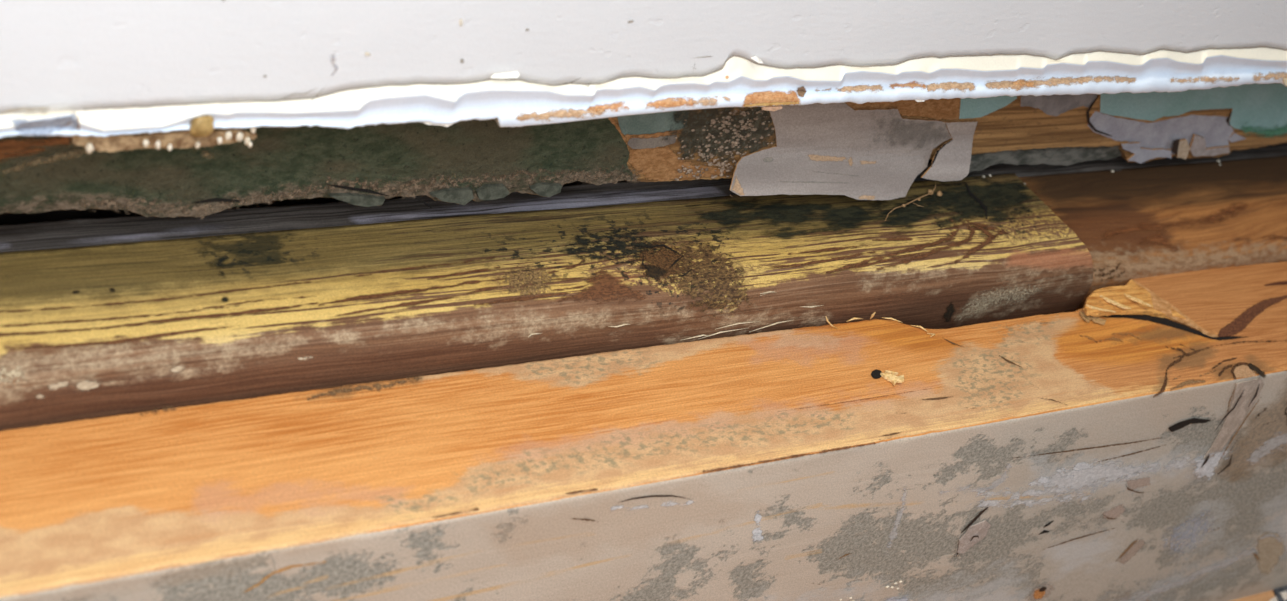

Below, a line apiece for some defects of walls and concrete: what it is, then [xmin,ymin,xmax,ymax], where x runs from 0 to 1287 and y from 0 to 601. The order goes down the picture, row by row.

leakage [0,118,634,218]
leakage [665,107,776,162]
peeling [608,83,1287,200]
spalling [0,208,141,224]
spalling [228,197,340,209]
leakage [559,230,659,260]
crack [758,237,915,271]
crack [0,257,586,349]
crack [1104,315,1287,398]